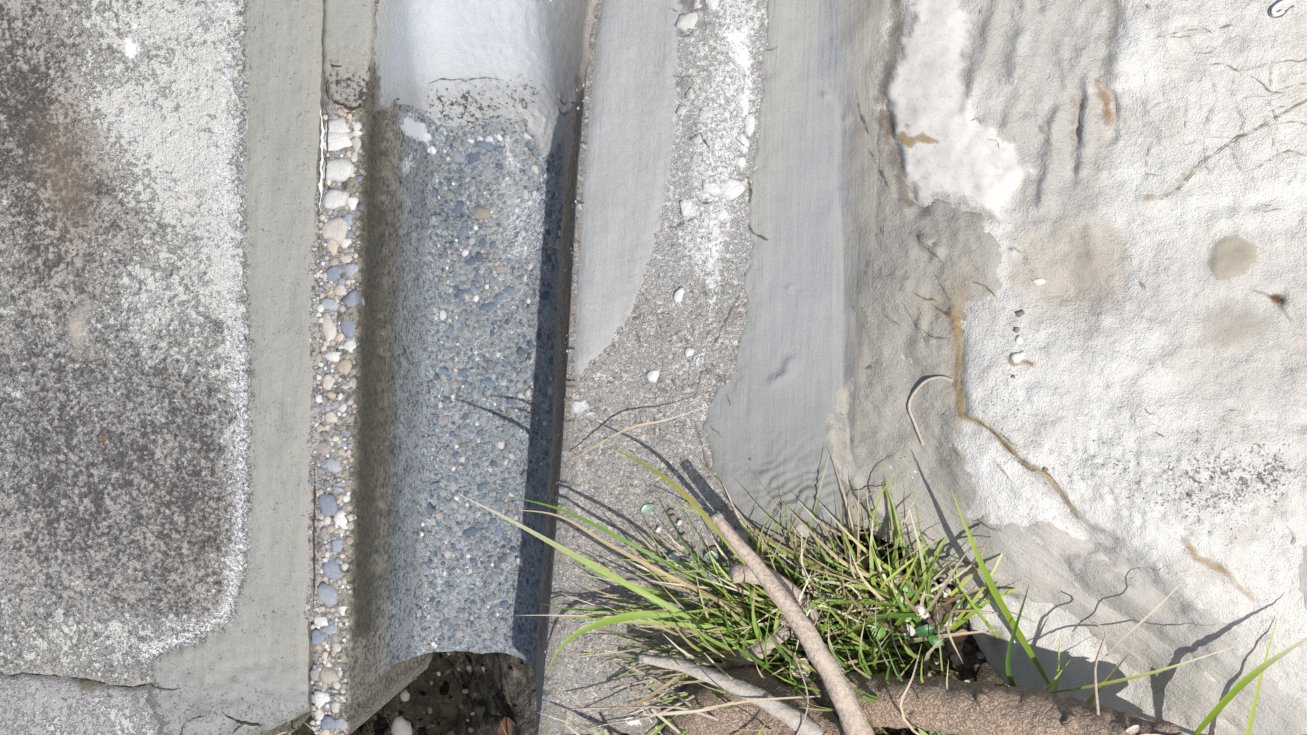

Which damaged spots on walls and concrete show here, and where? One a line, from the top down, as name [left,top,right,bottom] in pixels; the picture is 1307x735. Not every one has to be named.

leakage [1212,239,1256,279]
crack [967,417,1078,512]
crack [7,672,180,691]
crack [180,713,263,735]